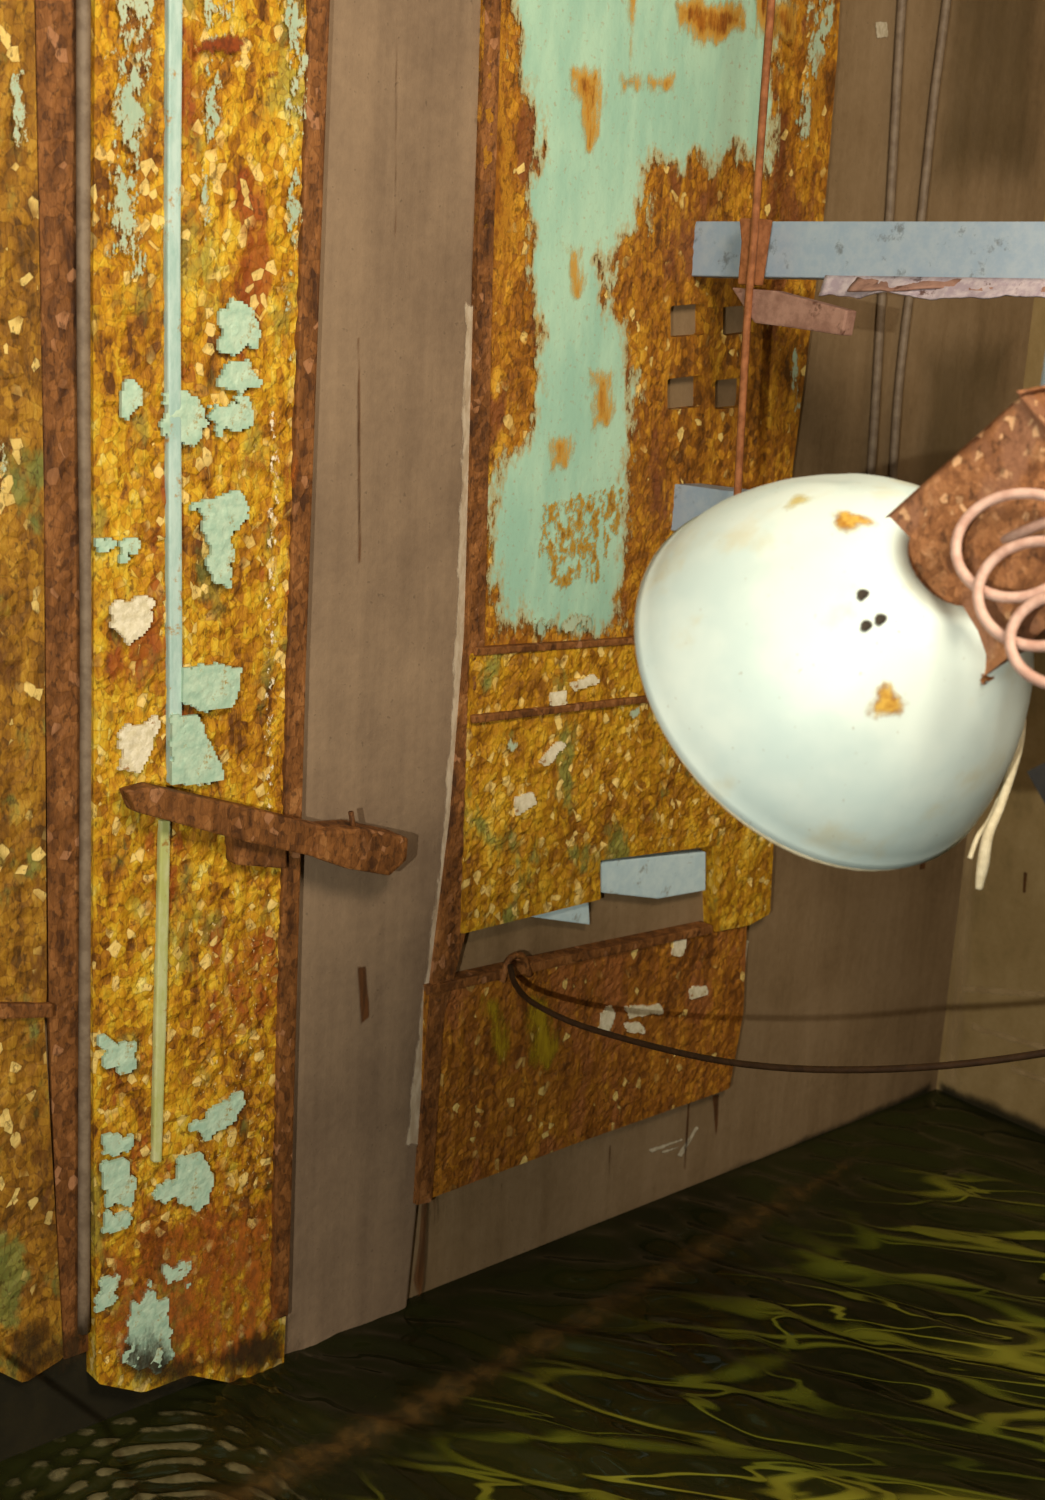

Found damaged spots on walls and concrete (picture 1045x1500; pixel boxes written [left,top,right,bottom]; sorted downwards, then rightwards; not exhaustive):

corrosion [195,33,245,55]
corrosion [676,0,796,61]
corrosion [571,67,602,151]
peeling [486,0,836,643]
corrosion [592,373,615,427]
peeling [158,298,280,643]
corrosion [539,486,624,589]
peeling [109,595,155,646]
peeling [117,661,243,786]
peeling [97,909,269,1238]
peeling [94,1260,217,1368]
corrosion [105,1205,278,1367]